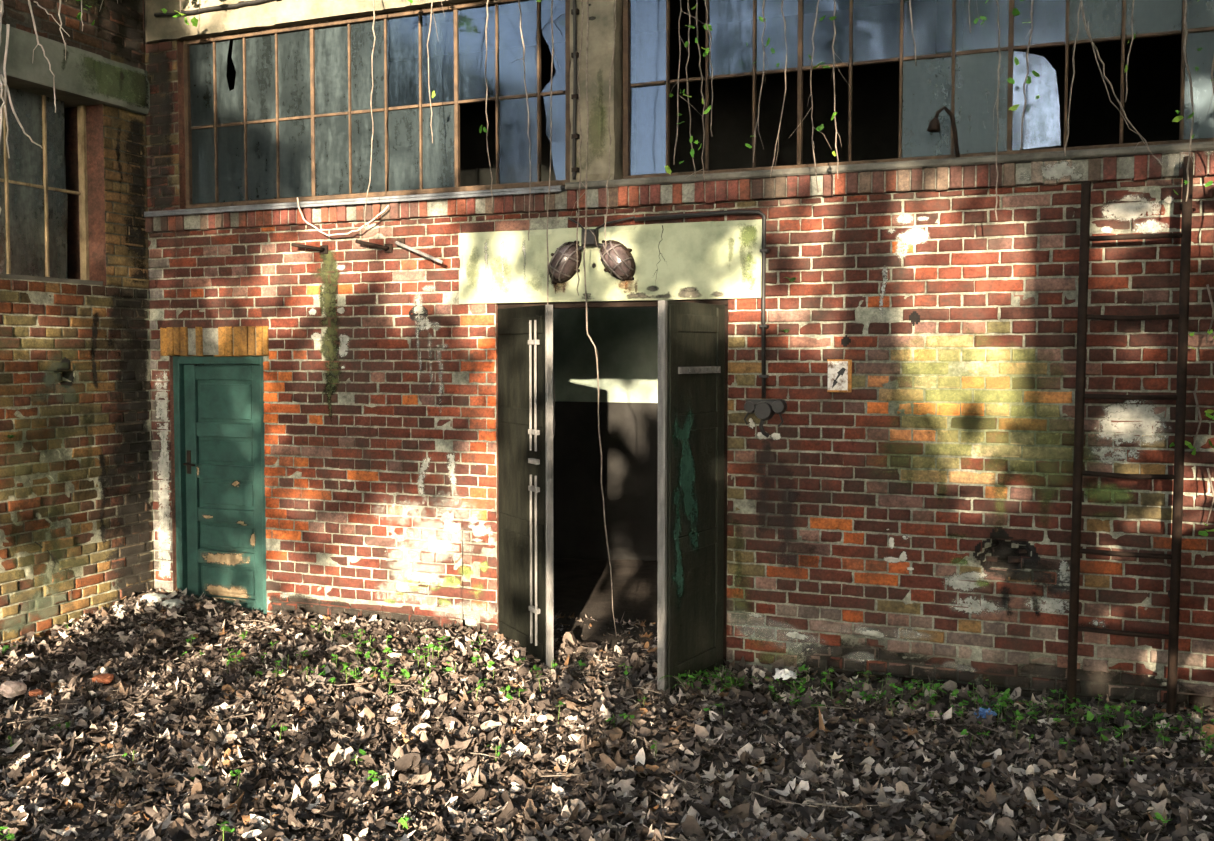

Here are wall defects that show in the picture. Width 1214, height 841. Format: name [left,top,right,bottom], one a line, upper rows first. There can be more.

flaking render [888,214,929,257]
spalling [1100,195,1174,233]
flaking render [879,268,888,314]
leakage [414,286,448,402]
leakage [375,454,495,625]
peeling [205,585,248,601]
leakage [943,540,1070,616]
leakage [731,610,830,654]
leakage [840,626,928,640]